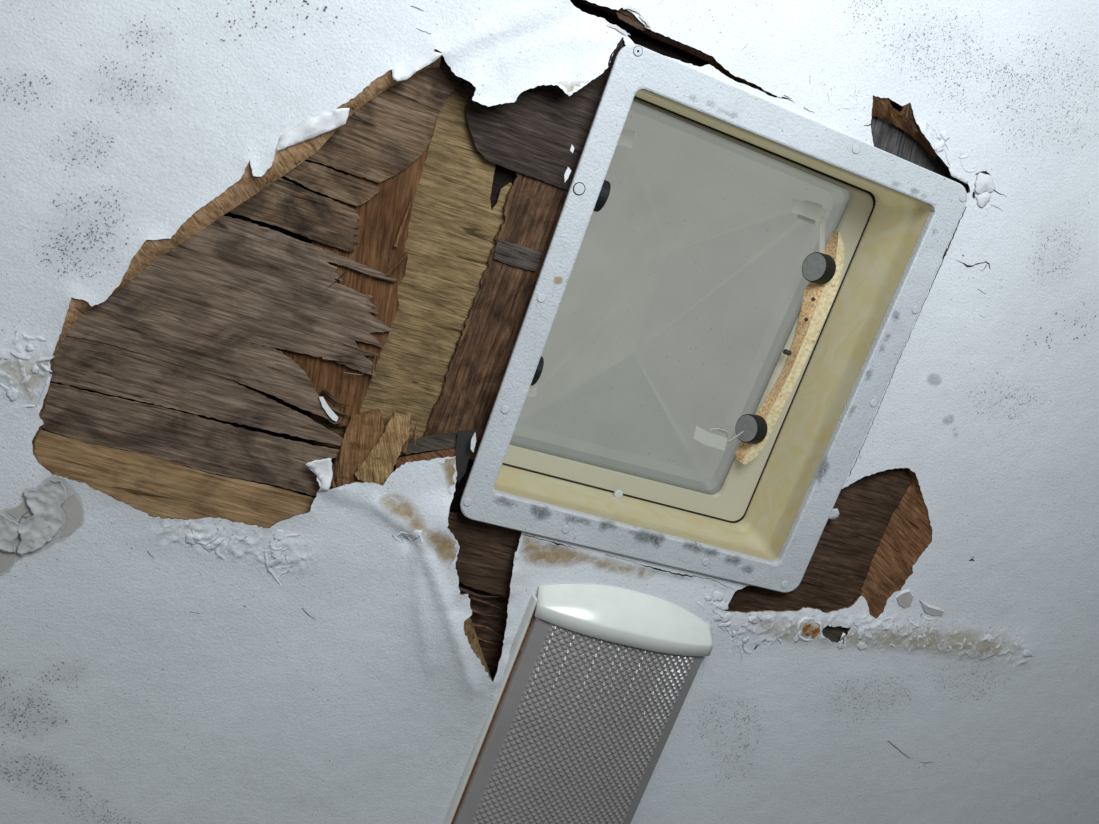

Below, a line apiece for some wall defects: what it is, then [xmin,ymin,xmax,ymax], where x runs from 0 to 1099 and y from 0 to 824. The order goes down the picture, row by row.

crack [608,38,624,66]
peeling [926,115,977,172]
crack [849,171,1007,476]
peeling [0,476,85,576]
rust [797,616,822,641]